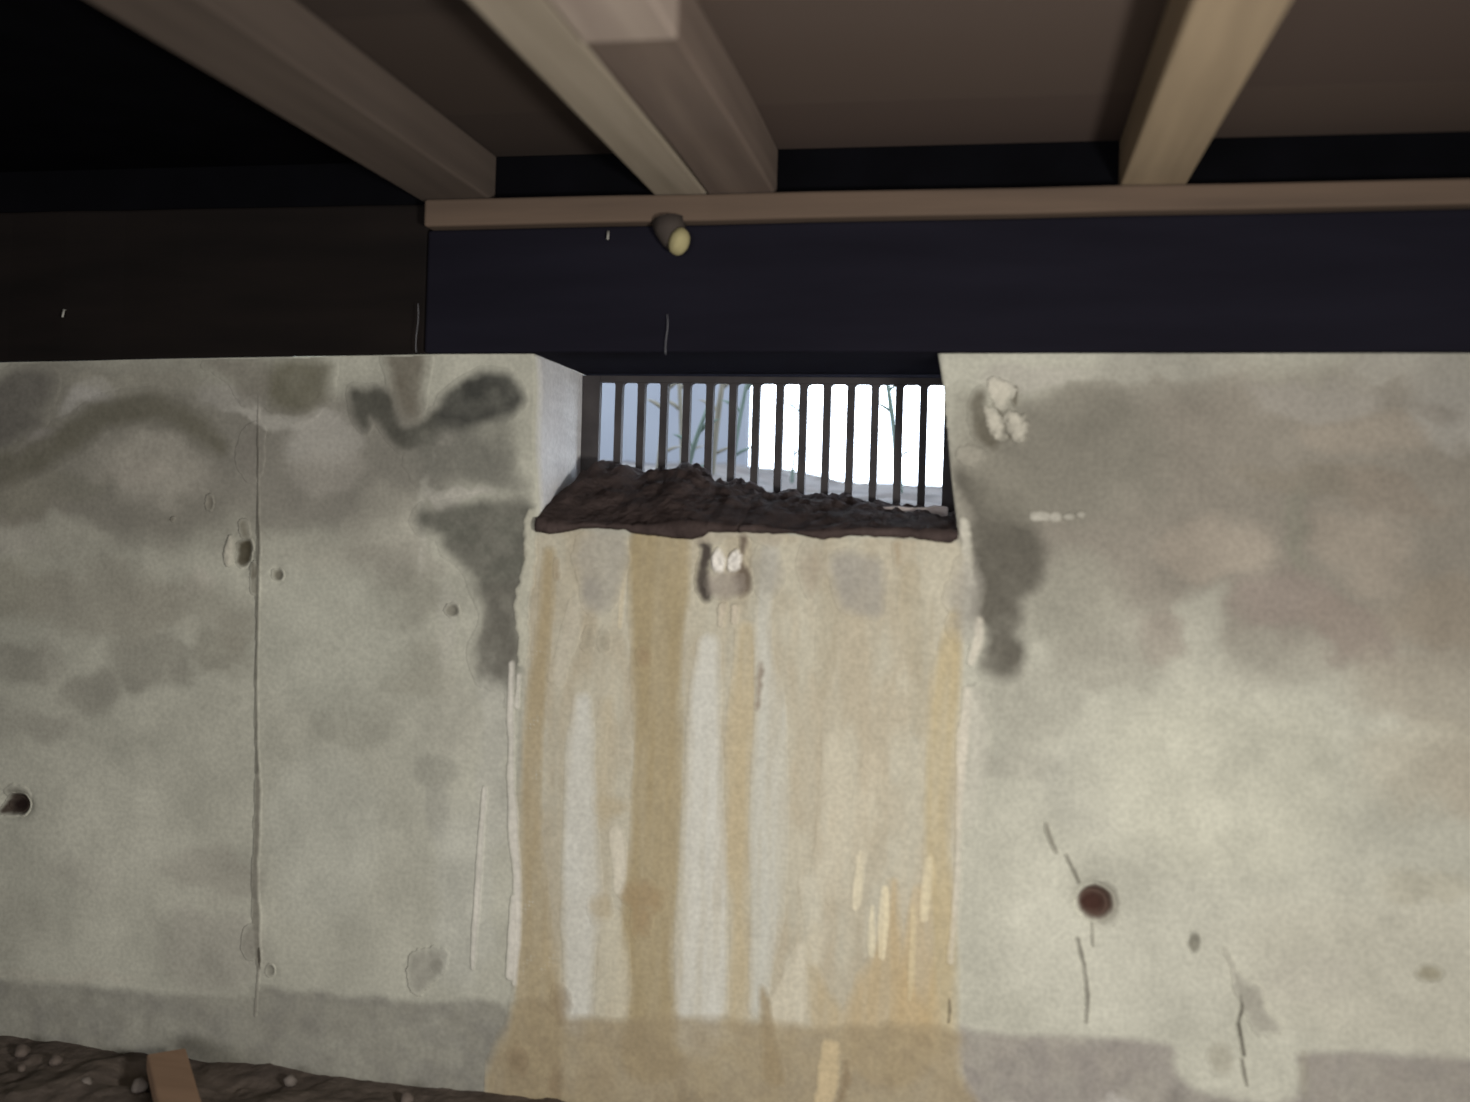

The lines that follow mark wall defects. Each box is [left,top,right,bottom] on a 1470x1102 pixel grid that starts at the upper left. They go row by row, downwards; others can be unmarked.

crack [240,396,263,1018]
spalling [223,518,286,583]
water stain [0,356,538,1092]
water stain [547,595,632,1017]
water stain [671,631,730,1014]
corrosion [484,528,983,1102]
spalling [690,532,788,628]
water stain [747,595,890,1022]
water stain [940,378,1087,966]
crack [1044,821,1082,884]
crack [1075,921,1095,1024]
crack [1221,946,1284,1087]